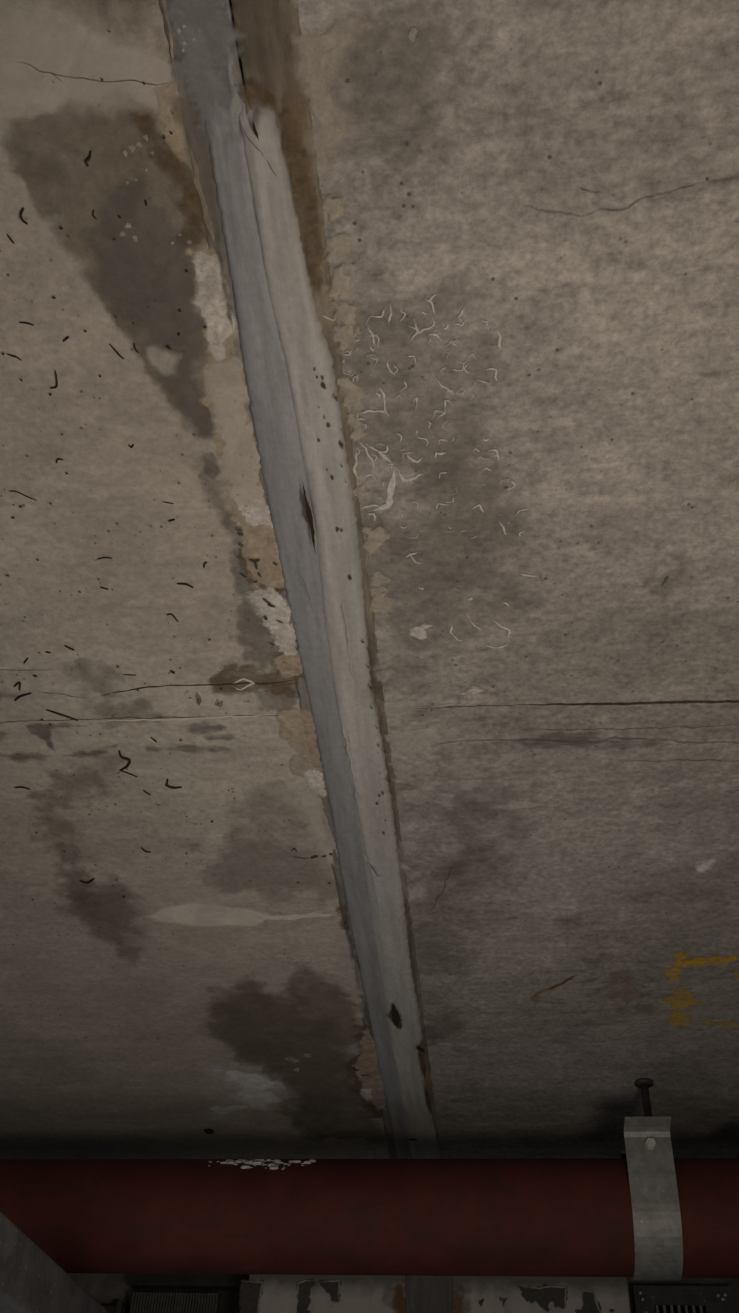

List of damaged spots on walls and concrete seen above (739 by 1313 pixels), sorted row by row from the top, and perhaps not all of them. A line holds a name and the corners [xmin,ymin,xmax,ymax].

leakage [0,0,273,527]
leakage [342,294,497,564]
spalling [237,529,277,583]
crack [49,670,297,698]
leakage [148,902,386,1158]
leakage [209,1159,316,1170]
peeling [239,1280,263,1313]
peeling [296,1280,341,1313]
peeling [500,1284,614,1313]